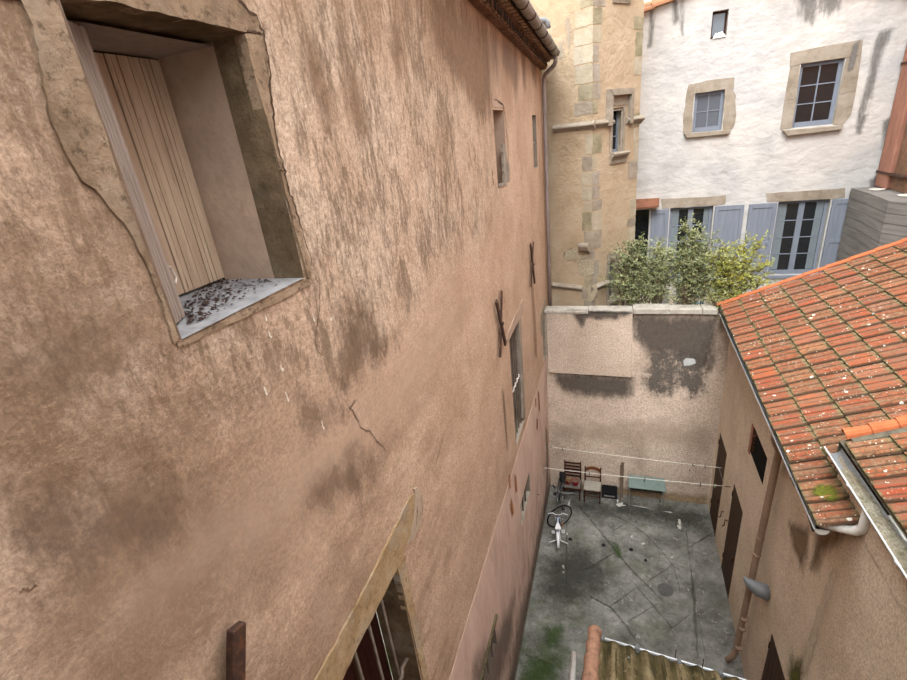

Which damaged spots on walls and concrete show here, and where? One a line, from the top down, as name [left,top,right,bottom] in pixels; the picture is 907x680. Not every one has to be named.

damp [848,43,858,71]
damp [856,30,890,133]
damp [573,310,717,398]
crack [343,397,386,450]